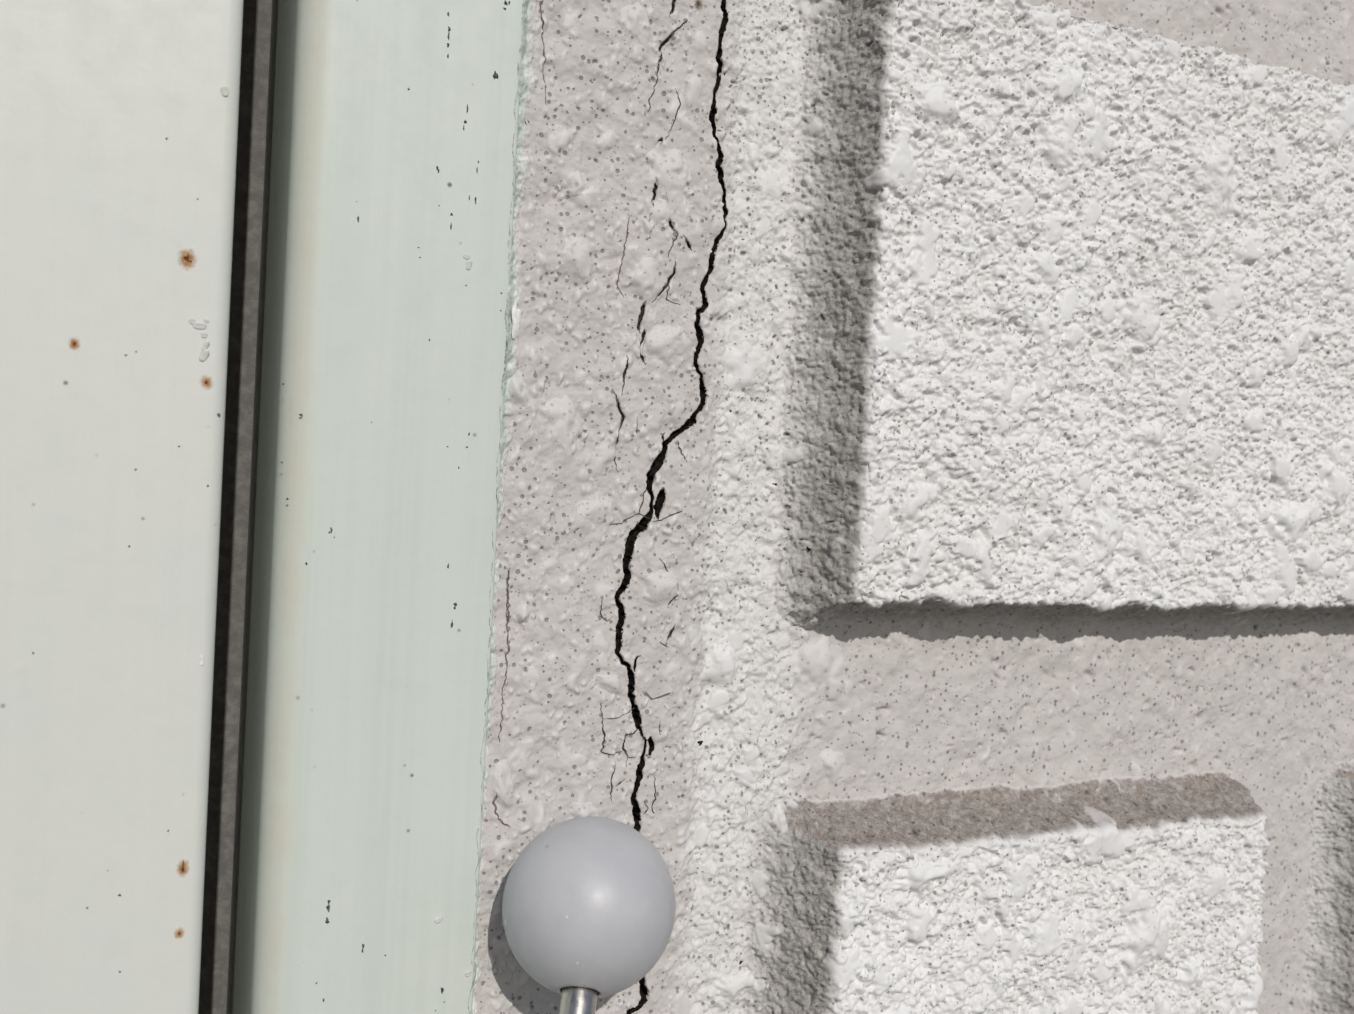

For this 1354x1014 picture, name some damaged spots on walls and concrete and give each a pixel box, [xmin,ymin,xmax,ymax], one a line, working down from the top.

rust [181,251,194,266]
crack [600,0,728,831]
crack [627,977,648,1014]